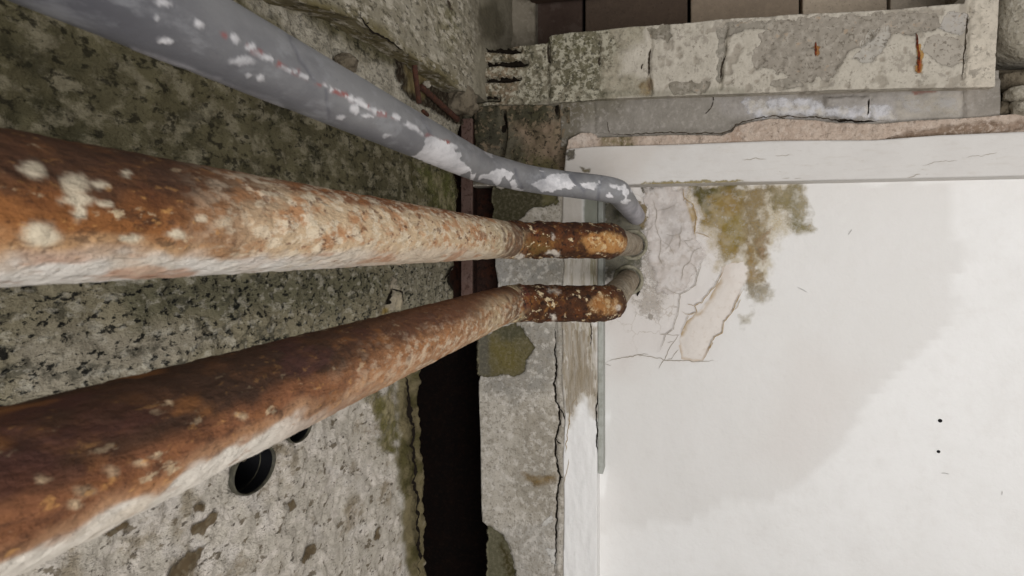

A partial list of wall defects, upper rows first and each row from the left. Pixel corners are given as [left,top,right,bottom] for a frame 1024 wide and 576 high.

peeling [647,24,672,43]
crack [598,56,884,135]
peeling [669,11,967,95]
leakage [742,97,897,120]
rust [915,34,924,73]
crack [961,14,969,75]
crack [590,187,744,368]
leakage [605,180,812,301]
crack [405,377,423,576]
crack [553,326,599,576]